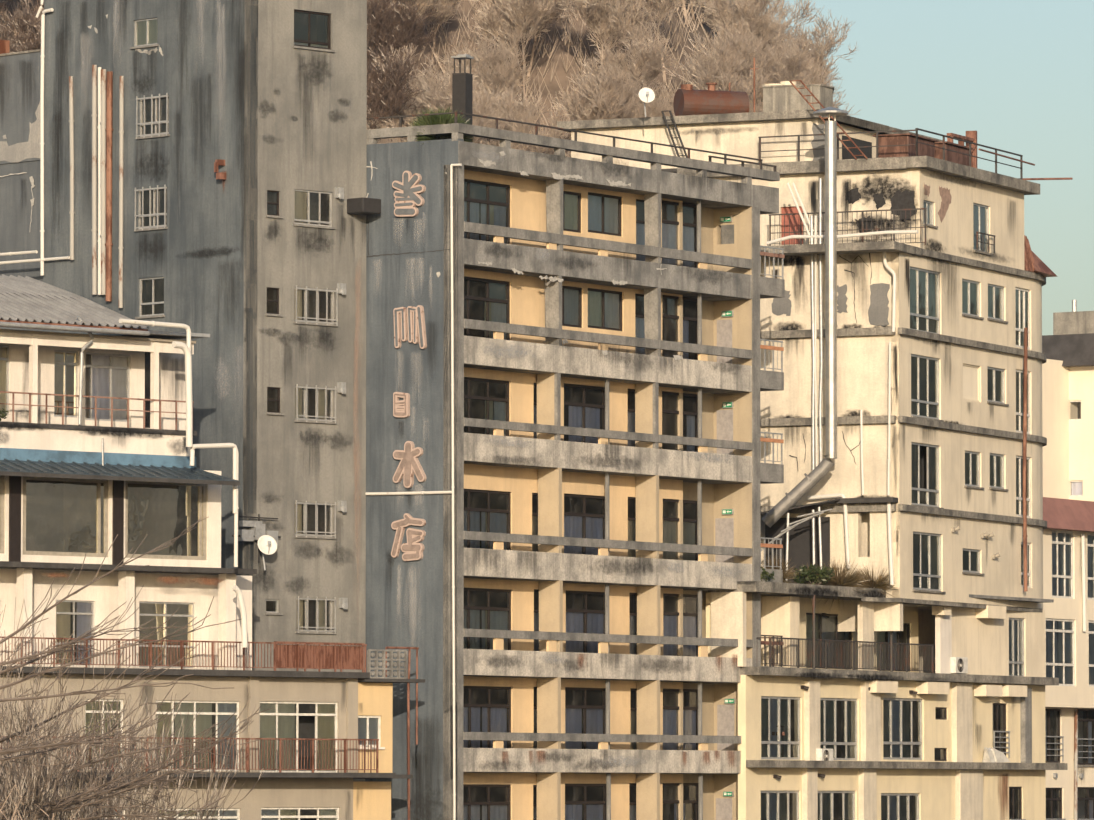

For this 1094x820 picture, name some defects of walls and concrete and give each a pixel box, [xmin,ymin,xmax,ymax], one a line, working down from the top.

flaking render [0,102,40,163]
peeling [811,181,819,213]
peeling [843,176,952,238]
damp [778,323,801,340]